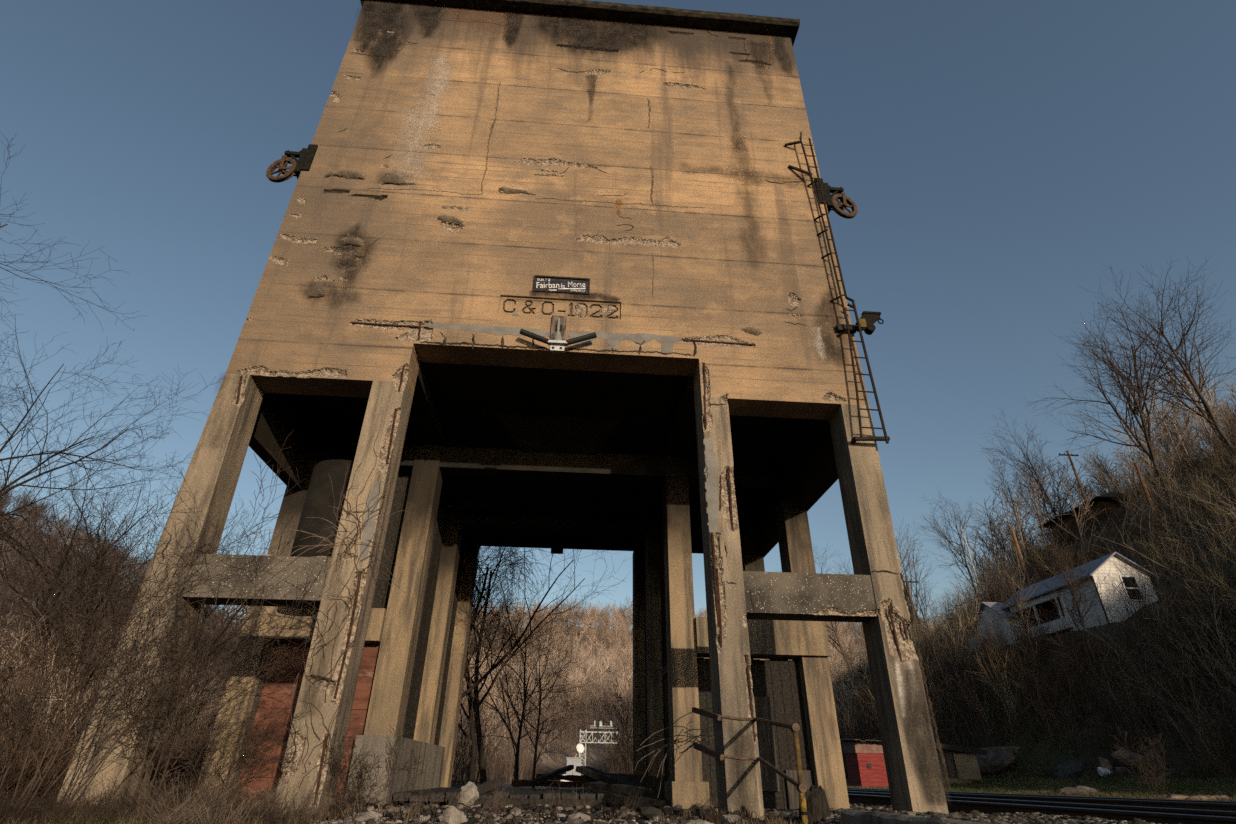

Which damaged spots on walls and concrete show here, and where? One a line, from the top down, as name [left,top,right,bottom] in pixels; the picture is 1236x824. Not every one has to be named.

water stain [360,1,441,71]
water stain [505,13,522,45]
water stain [539,16,656,52]
crack [367,82,702,231]
spalling [514,157,606,177]
spalling [575,234,681,248]
spalling [348,318,434,342]
spalling [681,334,756,348]
spalling [231,365,348,408]
spalling [701,361,729,432]